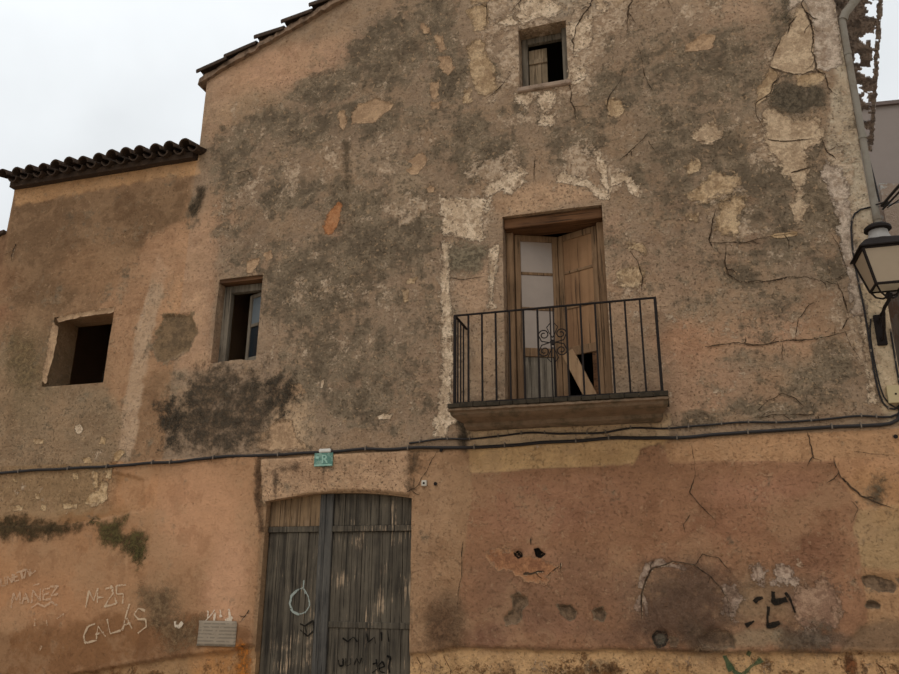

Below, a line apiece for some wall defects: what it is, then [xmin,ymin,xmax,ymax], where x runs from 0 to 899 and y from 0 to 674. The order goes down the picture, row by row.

peeling [462,0,566,105]
peeling [513,87,557,127]
crack [564,0,652,123]
crack [755,0,841,173]
peeling [756,0,881,405]
peeling [426,163,528,438]
crack [705,210,859,357]
water stain [0,513,94,541]
mould [152,362,297,454]
crack [683,445,715,531]
crack [753,393,897,521]
peeling [748,562,845,643]